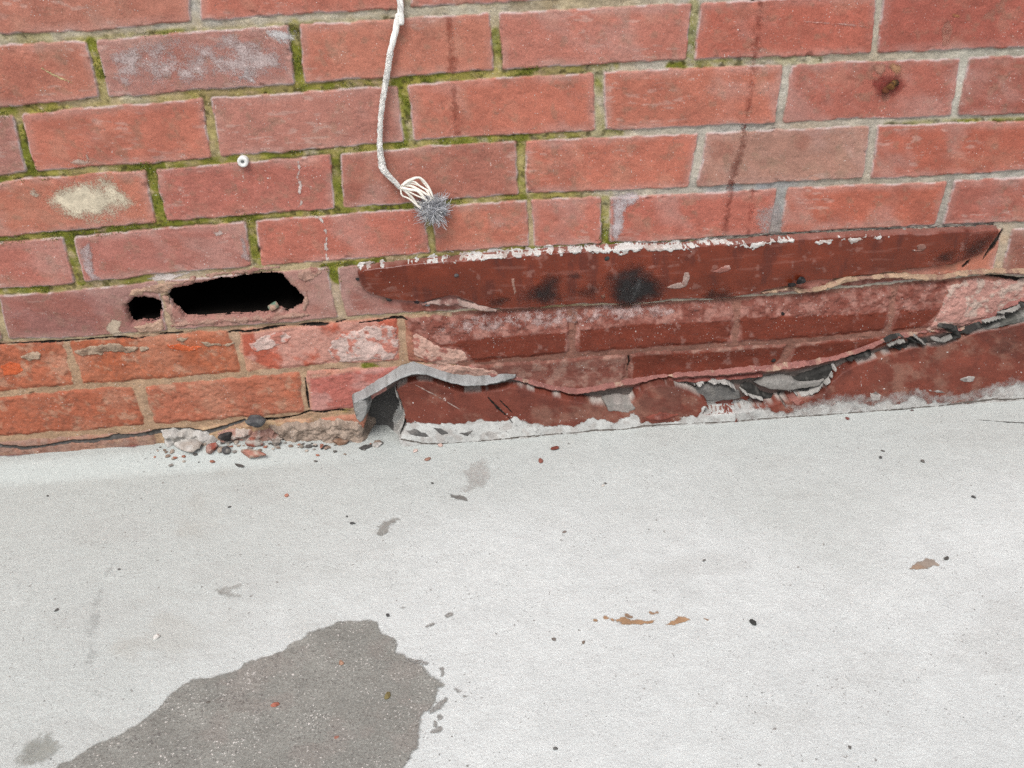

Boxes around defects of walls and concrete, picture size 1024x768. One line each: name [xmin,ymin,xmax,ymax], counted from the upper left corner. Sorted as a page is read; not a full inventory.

spalling [127,266,322,352]
spalling [414,297,498,312]
spalling [761,267,1024,331]
spalling [0,351,41,376]
spalling [74,343,149,356]
spalling [328,323,399,363]
spalling [412,333,498,376]
peeling [393,376,1024,463]
damp [57,620,466,768]